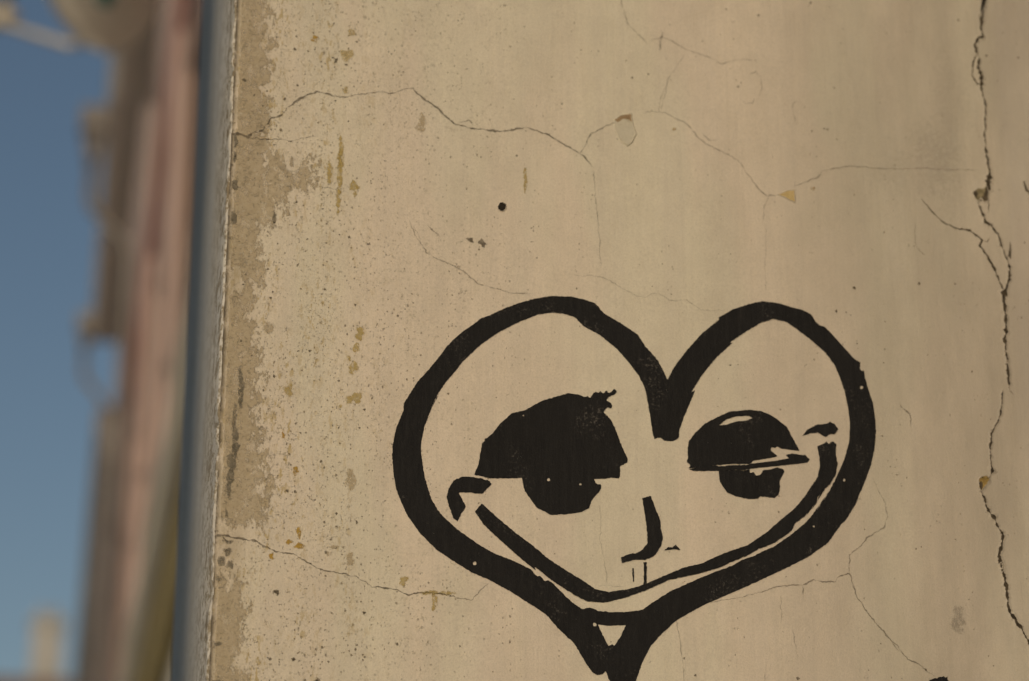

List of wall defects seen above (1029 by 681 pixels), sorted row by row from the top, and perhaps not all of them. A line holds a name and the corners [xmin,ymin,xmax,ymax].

crack [235,88,612,253]
crack [921,0,1029,656]
crack [223,534,483,599]